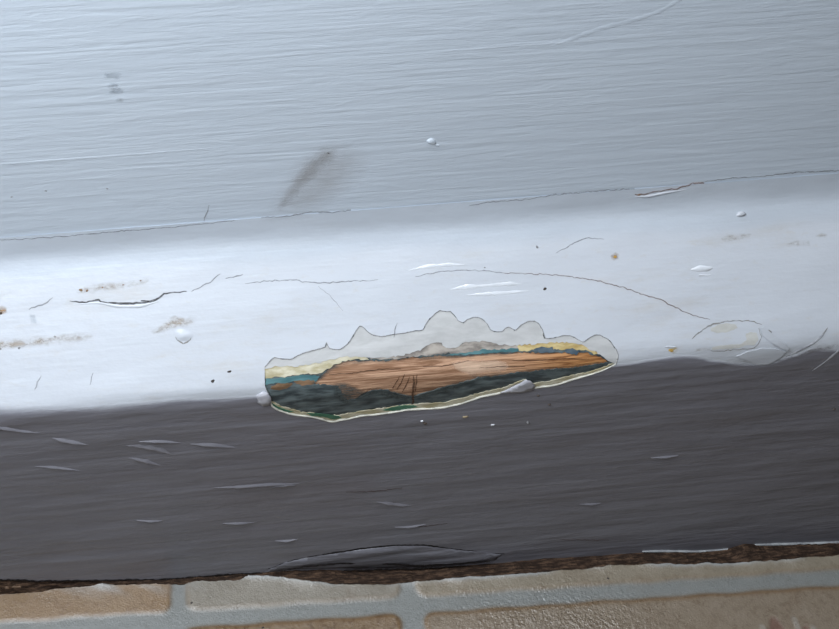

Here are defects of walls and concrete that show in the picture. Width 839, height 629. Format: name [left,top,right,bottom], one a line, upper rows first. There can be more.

crack [72,291,187,308]
crack [505,272,710,320]
peeling [257,310,618,423]